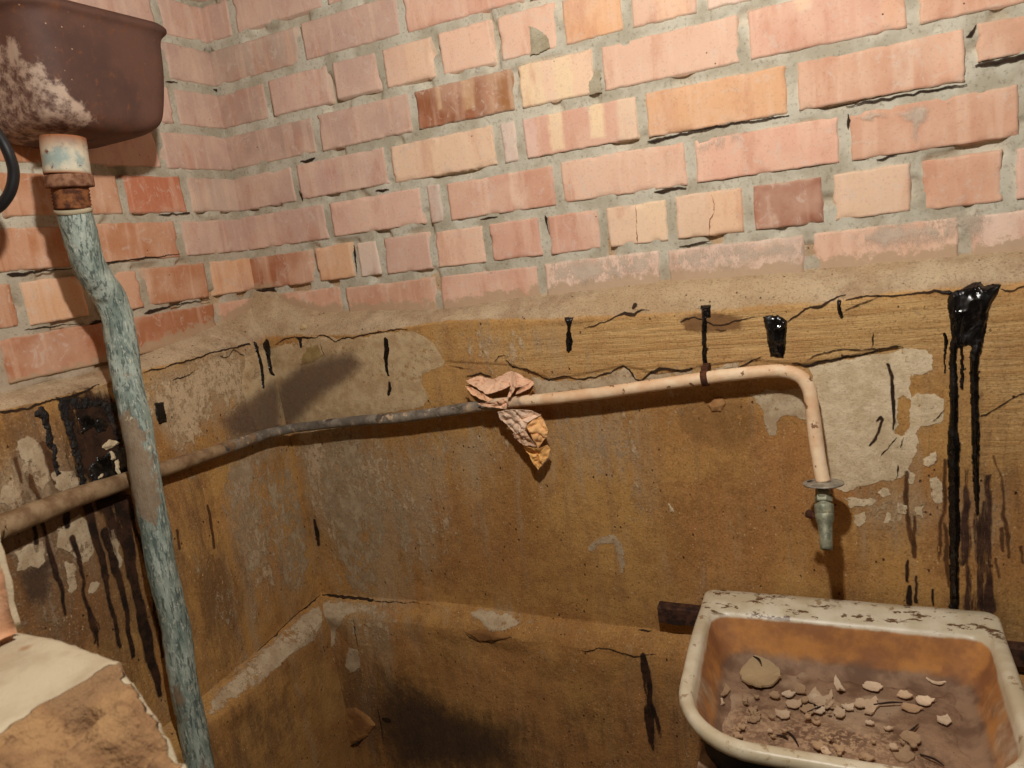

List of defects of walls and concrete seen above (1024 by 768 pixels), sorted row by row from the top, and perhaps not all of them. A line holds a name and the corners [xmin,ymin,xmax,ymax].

crack [586,303,645,328]
crack [787,289,950,322]
peeling [241,330,445,425]
crack [454,355,693,381]
crack [792,334,903,367]
peeling [16,436,79,491]
peeling [750,388,807,436]
peeling [809,347,944,527]
leakage [23,563,48,599]
peeling [15,514,100,594]
leakage [964,475,996,614]
leakage [640,653,661,750]